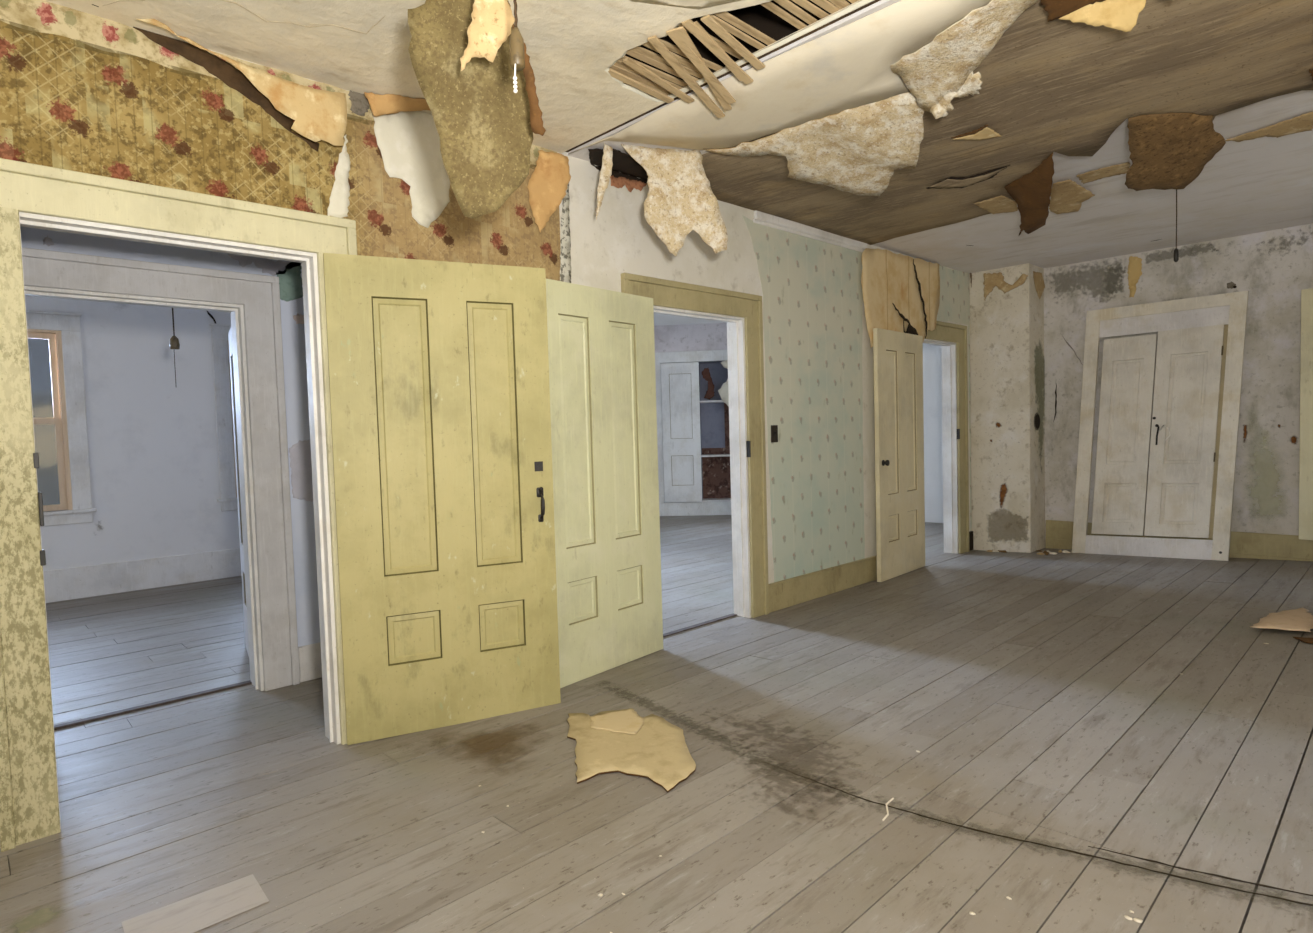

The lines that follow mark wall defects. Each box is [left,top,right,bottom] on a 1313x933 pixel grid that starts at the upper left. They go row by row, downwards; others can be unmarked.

flaking render [136,19,450,228]
peeling [460,0,515,71]
peeling [523,43,546,136]
flaking render [605,0,872,118]
peeling [929,71,983,119]
peeling [953,127,1001,141]
peeling [596,143,647,220]
peeling [974,196,1018,214]
peeling [861,248,940,348]
flaking render [983,271,1045,300]
rust [999,483,1007,508]